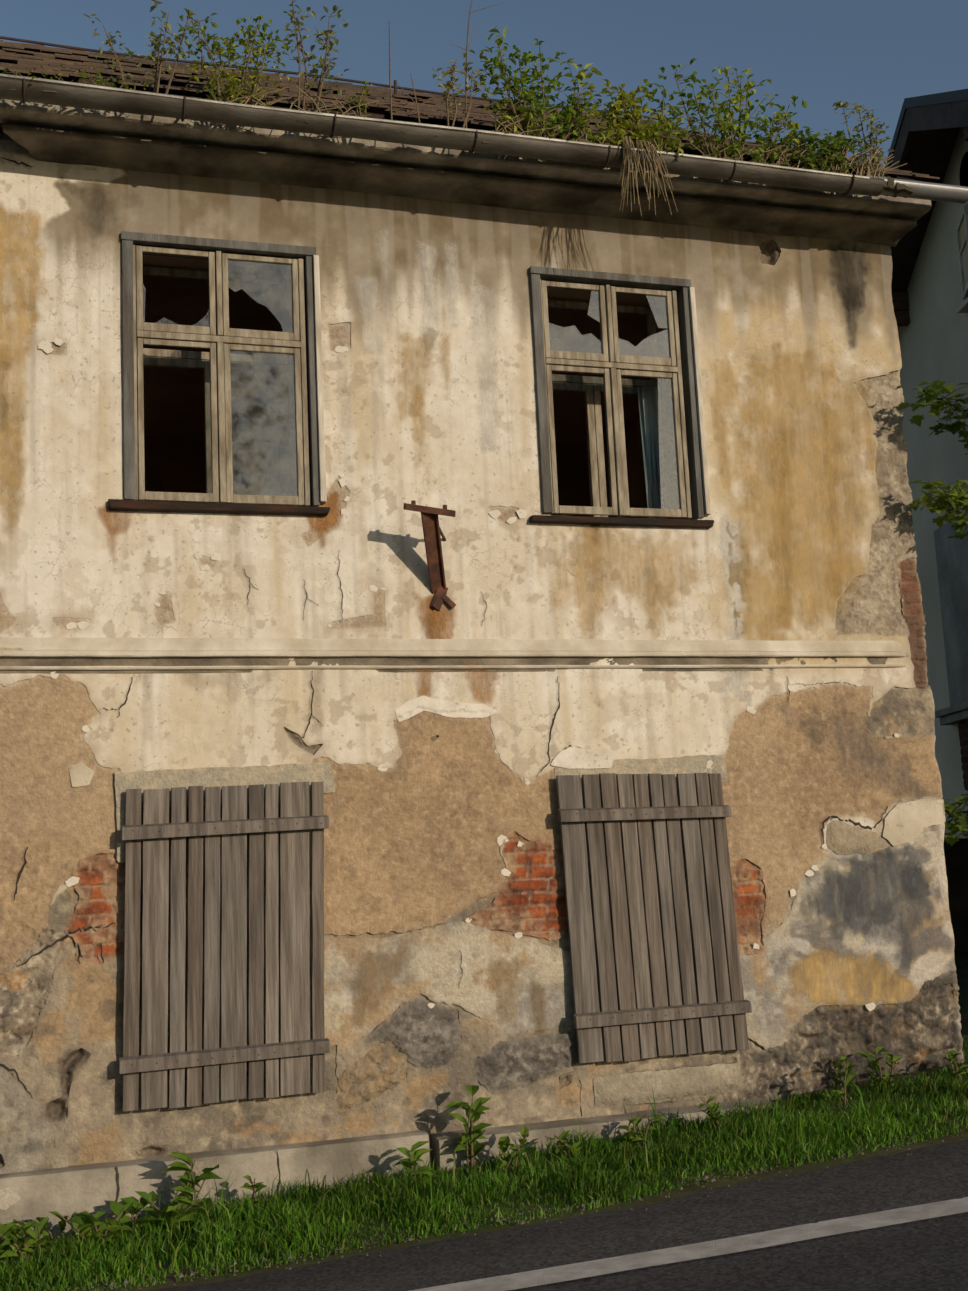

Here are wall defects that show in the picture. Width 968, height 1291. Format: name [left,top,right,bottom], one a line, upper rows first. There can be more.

water stain [831,243,866,322]
water stain [0,208,39,520]
water stain [722,352,857,640]
peeling [0,593,23,650]
corrosion [421,598,452,639]
corrosion [419,669,429,695]
spalling [722,370,946,956]
flaking render [958,722,968,791]
spalling [0,672,721,1174]
crack [0,1063,32,1099]